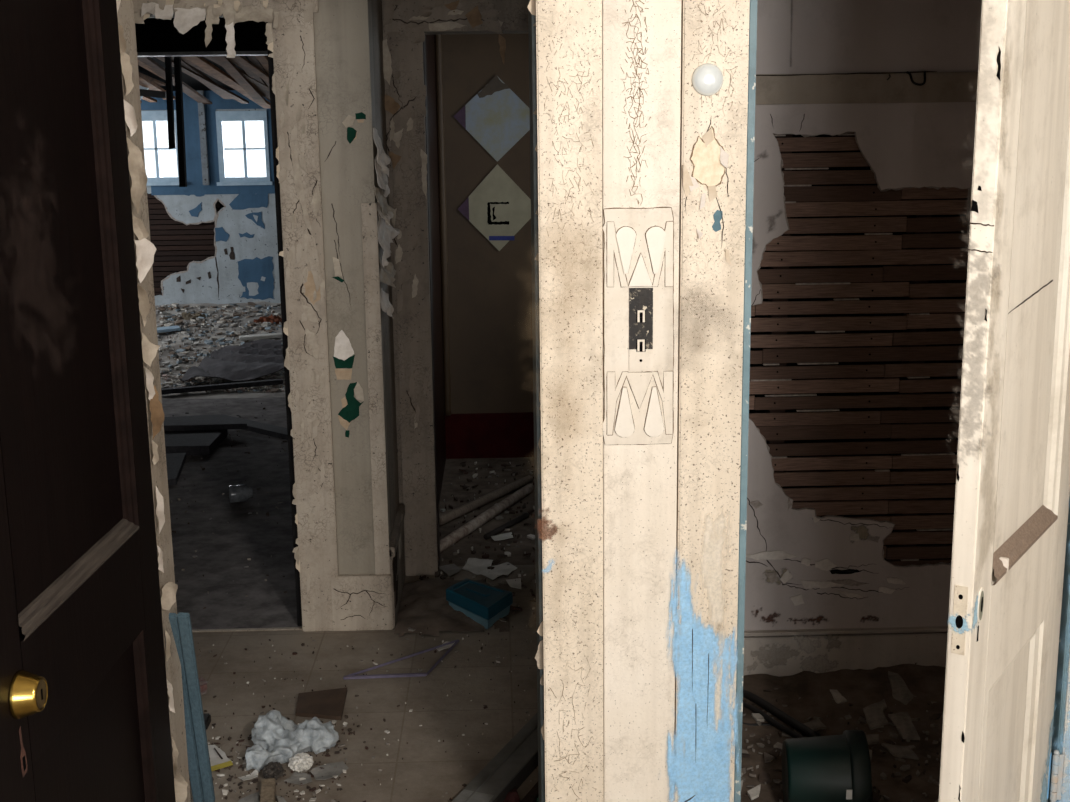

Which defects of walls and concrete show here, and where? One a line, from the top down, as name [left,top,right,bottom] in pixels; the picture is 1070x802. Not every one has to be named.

peeling [527,0,536,26]
peeling [116,0,284,465]
crack [278,1,325,524]
peeling [325,39,427,318]
peeling [333,330,364,438]
spalling [746,132,982,606]
peeling [156,487,178,611]
crack [306,574,384,620]
peeling [535,621,544,686]
peeling [667,514,738,802]
crack [746,498,797,585]
peeling [172,737,188,802]